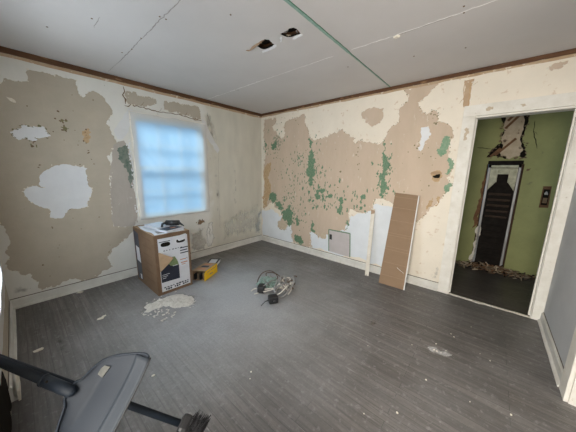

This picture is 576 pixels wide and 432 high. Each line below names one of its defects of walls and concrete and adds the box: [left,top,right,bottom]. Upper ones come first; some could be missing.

peeling [125,90,157,107]
peeling [164,100,201,121]
peeling [460,78,475,108]
flaking render [487,117,506,159]
flaking render [514,115,530,160]
peeling [0,68,139,291]
peeling [261,84,454,267]